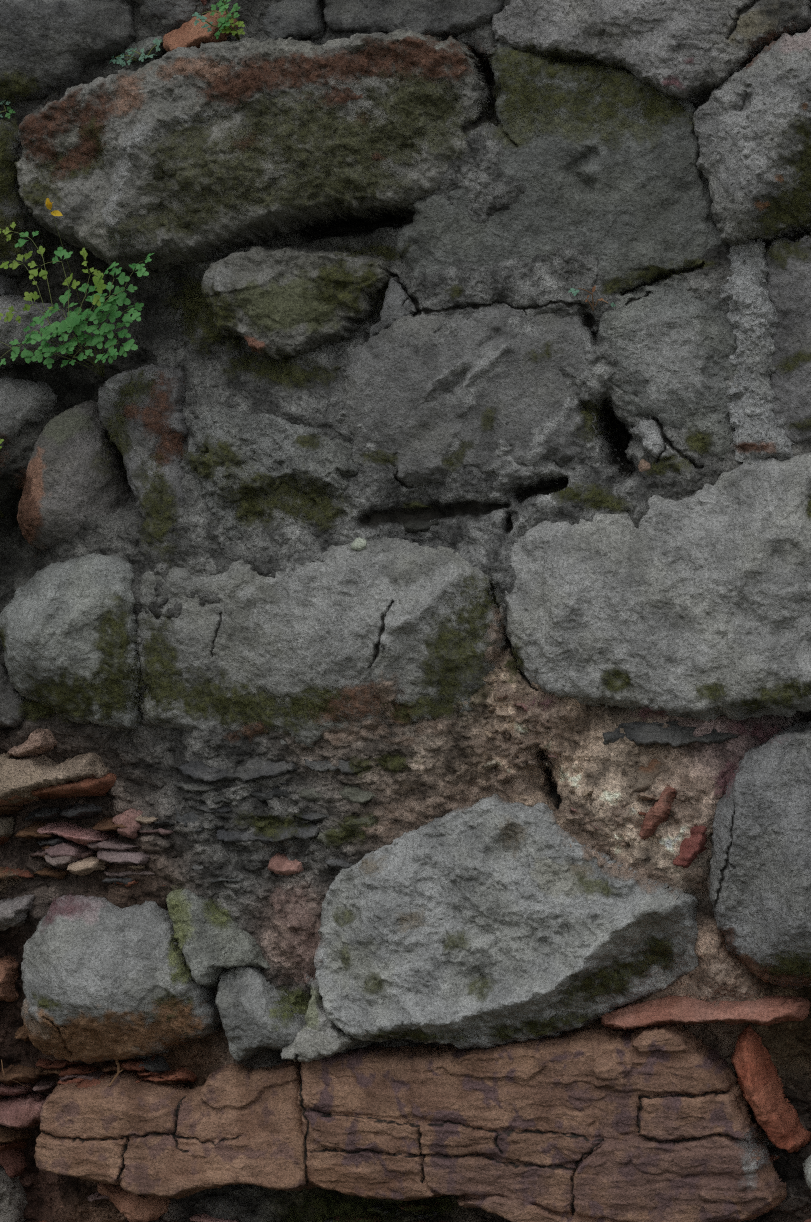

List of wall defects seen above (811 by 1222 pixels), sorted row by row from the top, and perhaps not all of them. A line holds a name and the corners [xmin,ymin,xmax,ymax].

crack [371,601,394,666]